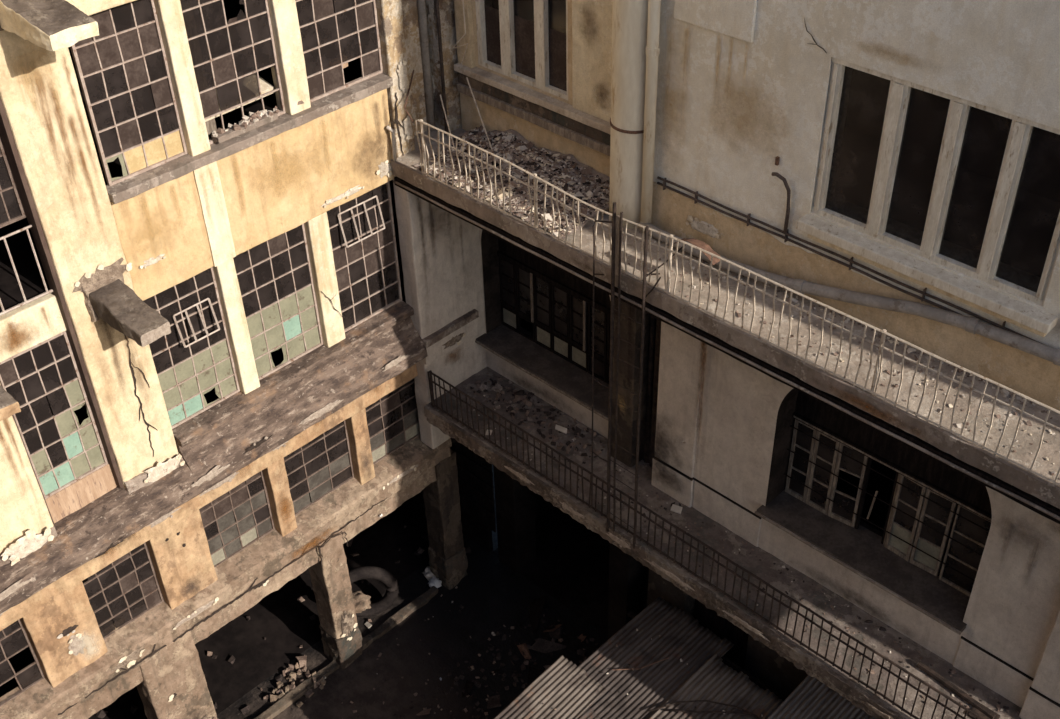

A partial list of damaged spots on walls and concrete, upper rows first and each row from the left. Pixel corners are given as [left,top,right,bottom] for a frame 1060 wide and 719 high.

flaking render [72,254,166,293]
crack [125,336,158,457]
spalling [144,454,185,483]
spalling [1,527,54,566]